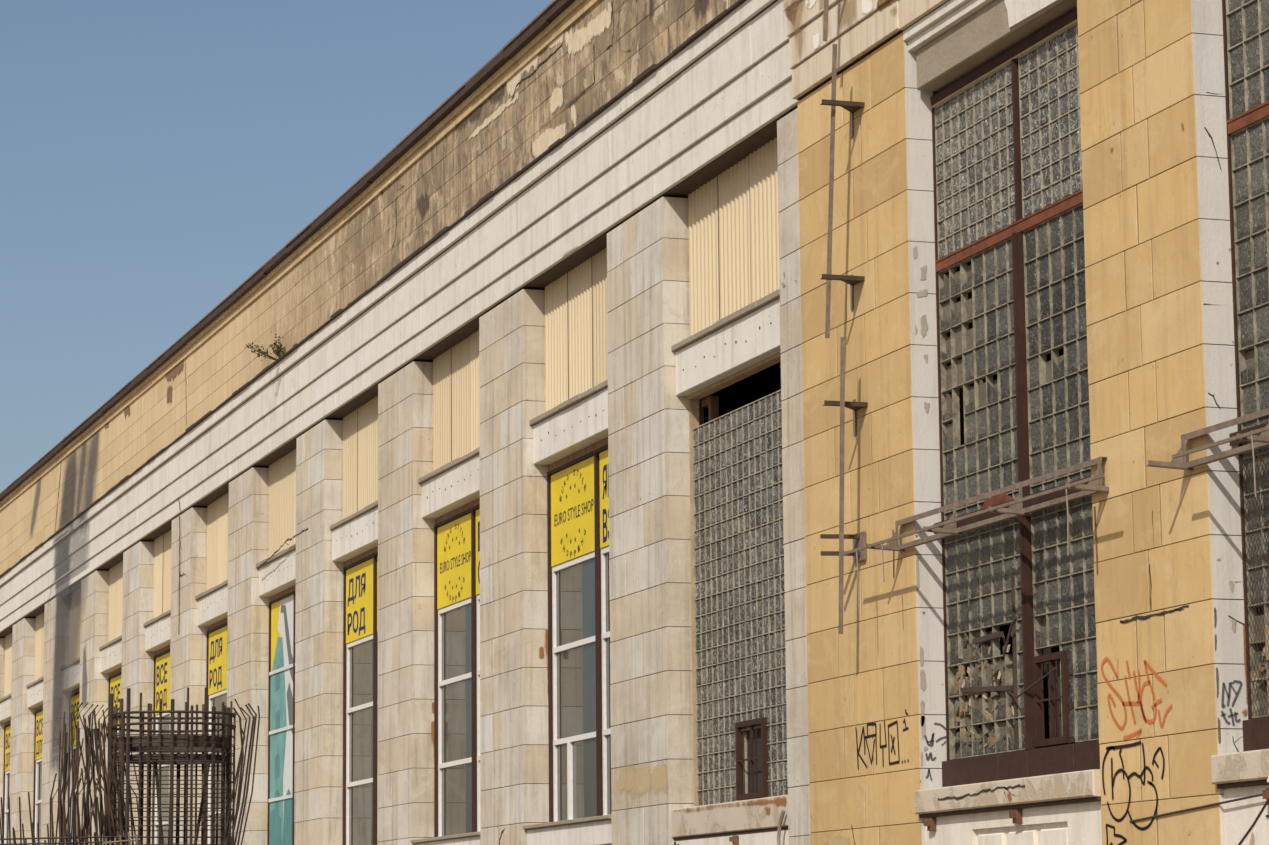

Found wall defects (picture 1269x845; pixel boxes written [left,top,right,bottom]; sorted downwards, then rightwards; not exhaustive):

peeling [785,0,816,24]
peeling [861,0,897,14]
peeling [469,2,612,140]
water stain [457,86,504,130]
peeling [532,86,577,159]
water stain [418,194,428,218]